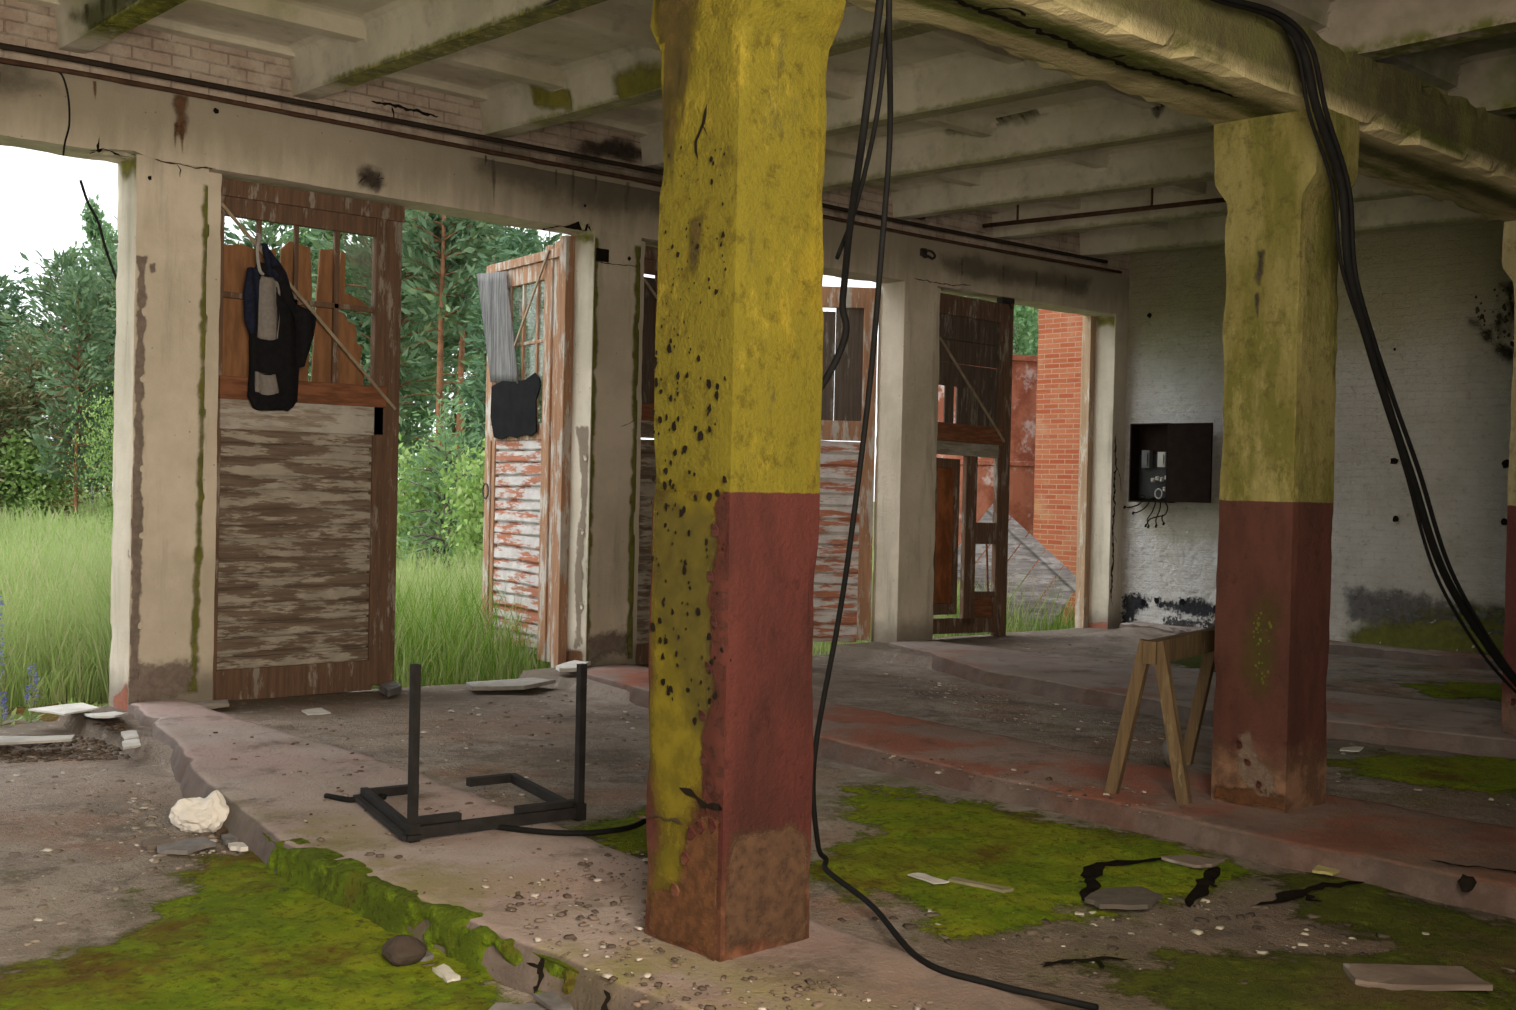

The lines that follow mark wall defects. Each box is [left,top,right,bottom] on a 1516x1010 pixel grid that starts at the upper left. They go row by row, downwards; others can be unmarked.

water stain [75,0,138,30]
crack [952,0,1243,99]
water stain [1469,283,1515,361]
crack [1079,858,1161,901]
crack [1185,867,1221,907]
crack [1256,881,1363,905]